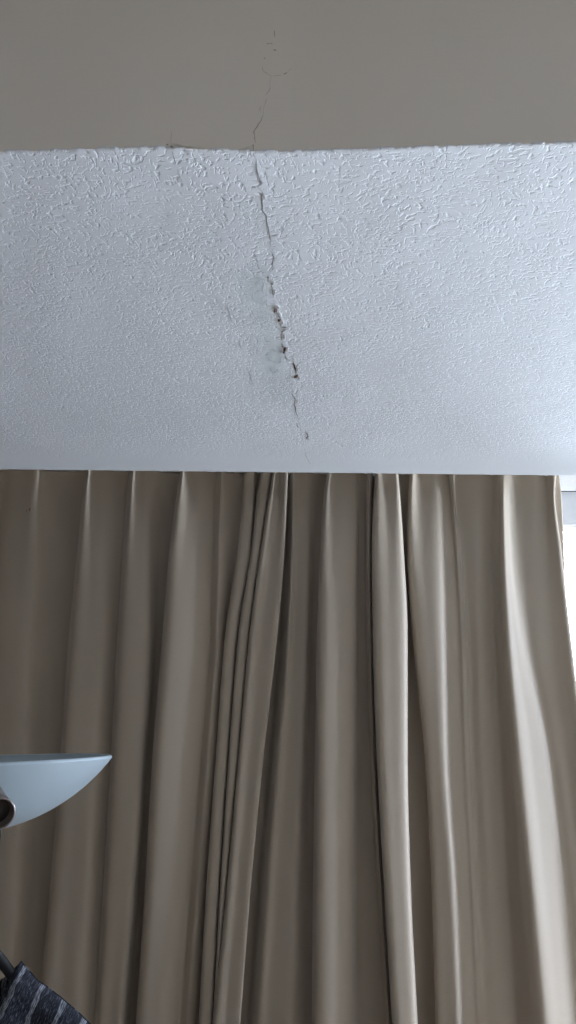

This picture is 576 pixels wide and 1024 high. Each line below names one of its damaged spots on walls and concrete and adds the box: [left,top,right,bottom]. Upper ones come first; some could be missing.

crack [253,30,310,463]